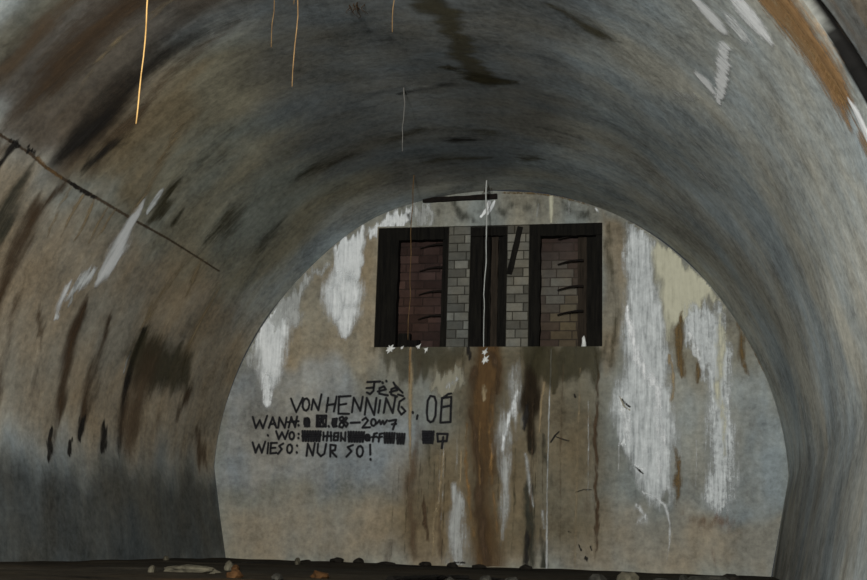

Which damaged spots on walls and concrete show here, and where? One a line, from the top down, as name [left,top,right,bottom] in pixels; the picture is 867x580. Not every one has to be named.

rust [758,0,867,153]
crack [0,133,220,271]
leakage [118,290,218,450]
leakage [246,204,434,407]
leakage [610,224,738,520]
rust [674,315,685,378]
rust [737,324,763,372]
rust [464,347,501,567]
leakage [499,346,601,569]
rust [673,448,681,499]